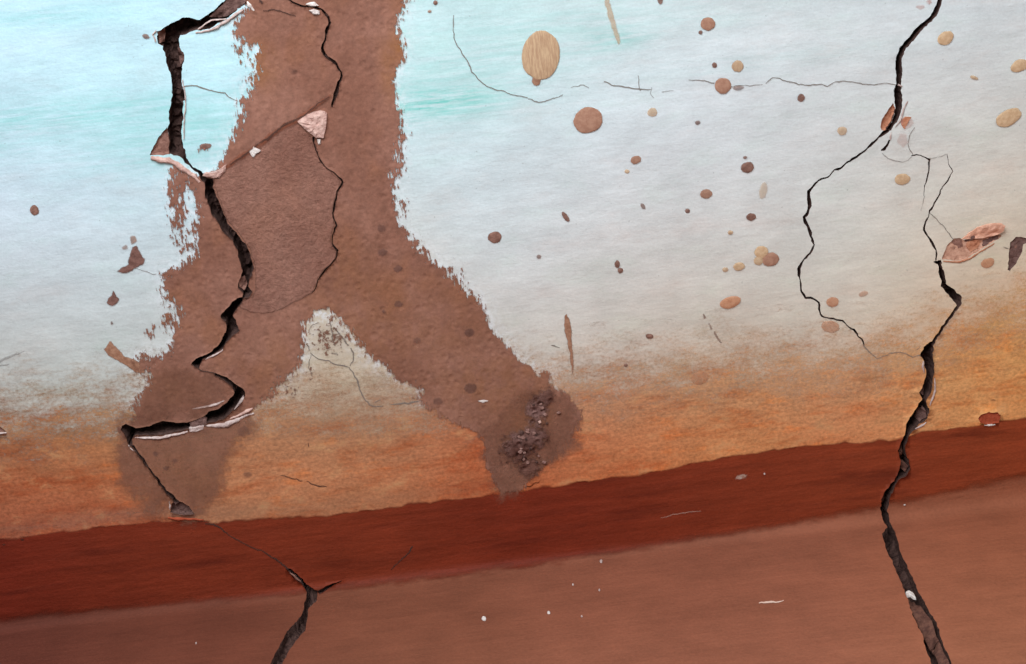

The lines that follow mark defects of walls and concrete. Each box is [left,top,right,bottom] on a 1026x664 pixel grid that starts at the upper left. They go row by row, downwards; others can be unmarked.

crack [453,15,650,103]
crack [121,0,344,664]
rust [0,289,1026,539]
crack [692,0,962,664]
flaking render [942,223,1026,271]